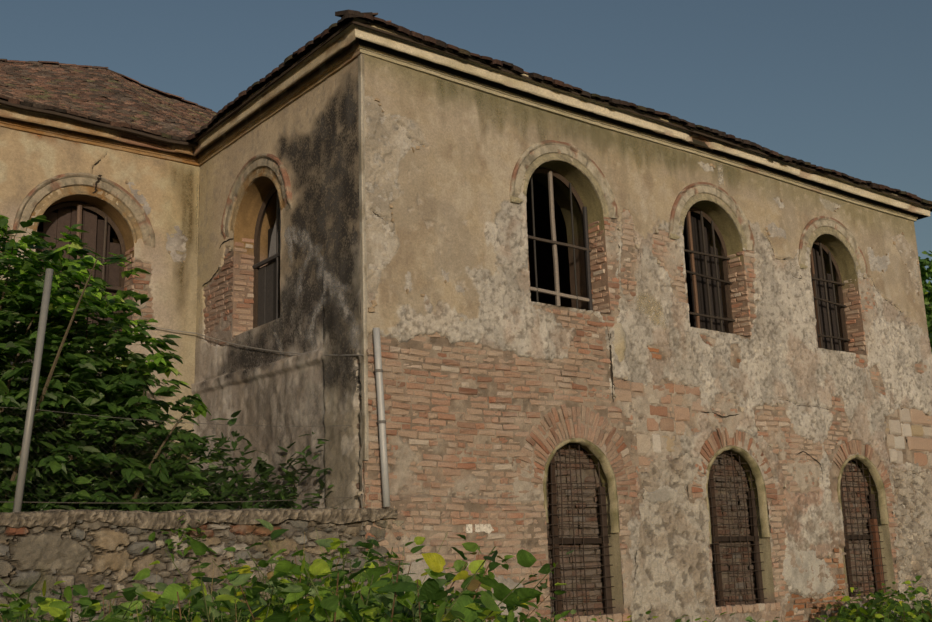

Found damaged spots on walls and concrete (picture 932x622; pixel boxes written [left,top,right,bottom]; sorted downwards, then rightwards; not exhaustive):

flaking render [132,260,155,323]
flaking render [203,247,236,347]
water stain [223,81,361,398]
flaking render [854,232,920,396]
flaking render [356,209,852,622]
flaking render [884,406,932,471]